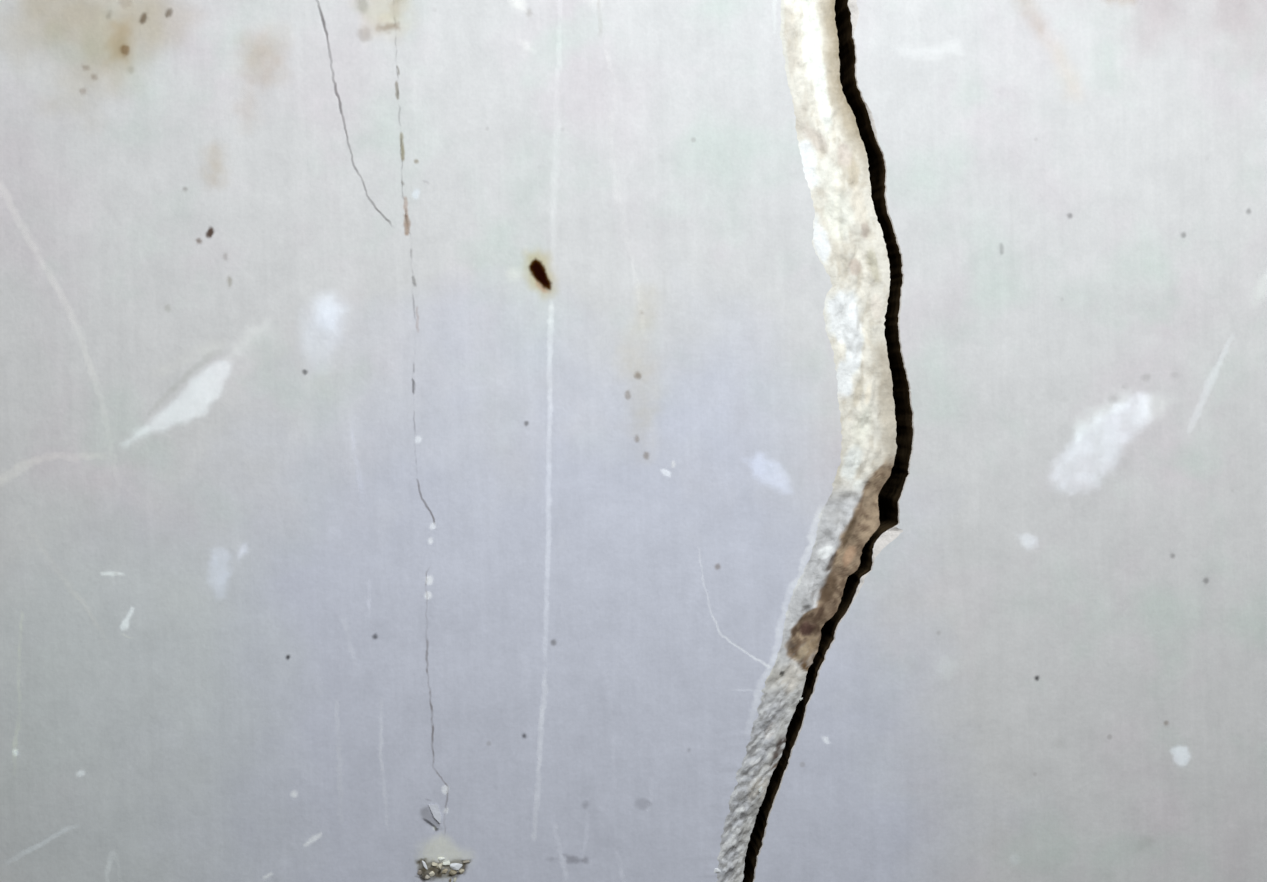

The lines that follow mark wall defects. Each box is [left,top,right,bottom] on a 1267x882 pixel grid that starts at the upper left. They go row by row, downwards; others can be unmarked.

corrosion [530,259,551,289]
crack [714,0,915,882]
spalling [417,857,469,882]